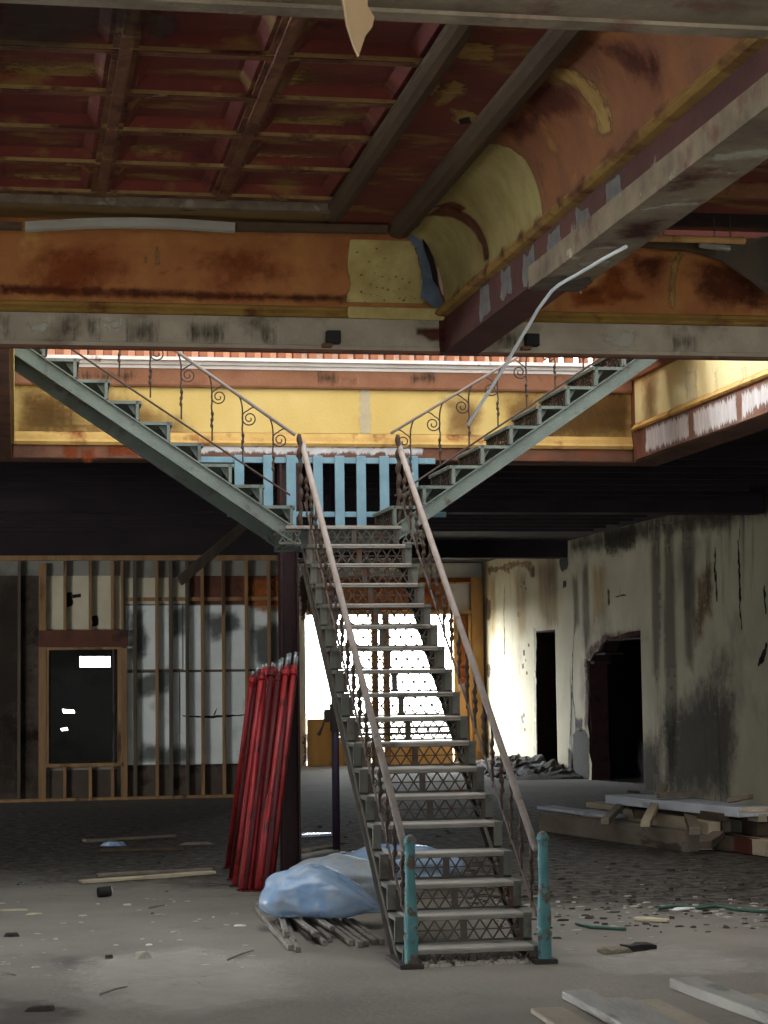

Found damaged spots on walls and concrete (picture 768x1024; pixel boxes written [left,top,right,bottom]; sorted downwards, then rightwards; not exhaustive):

corrosion [600,45,659,82]
corrosion [508,85,579,141]
peeling [605,173,622,203]
peeling [346,143,593,323]
corrosion [0,285,345,302]
peeling [646,384,768,453]
crack [714,529,767,630]